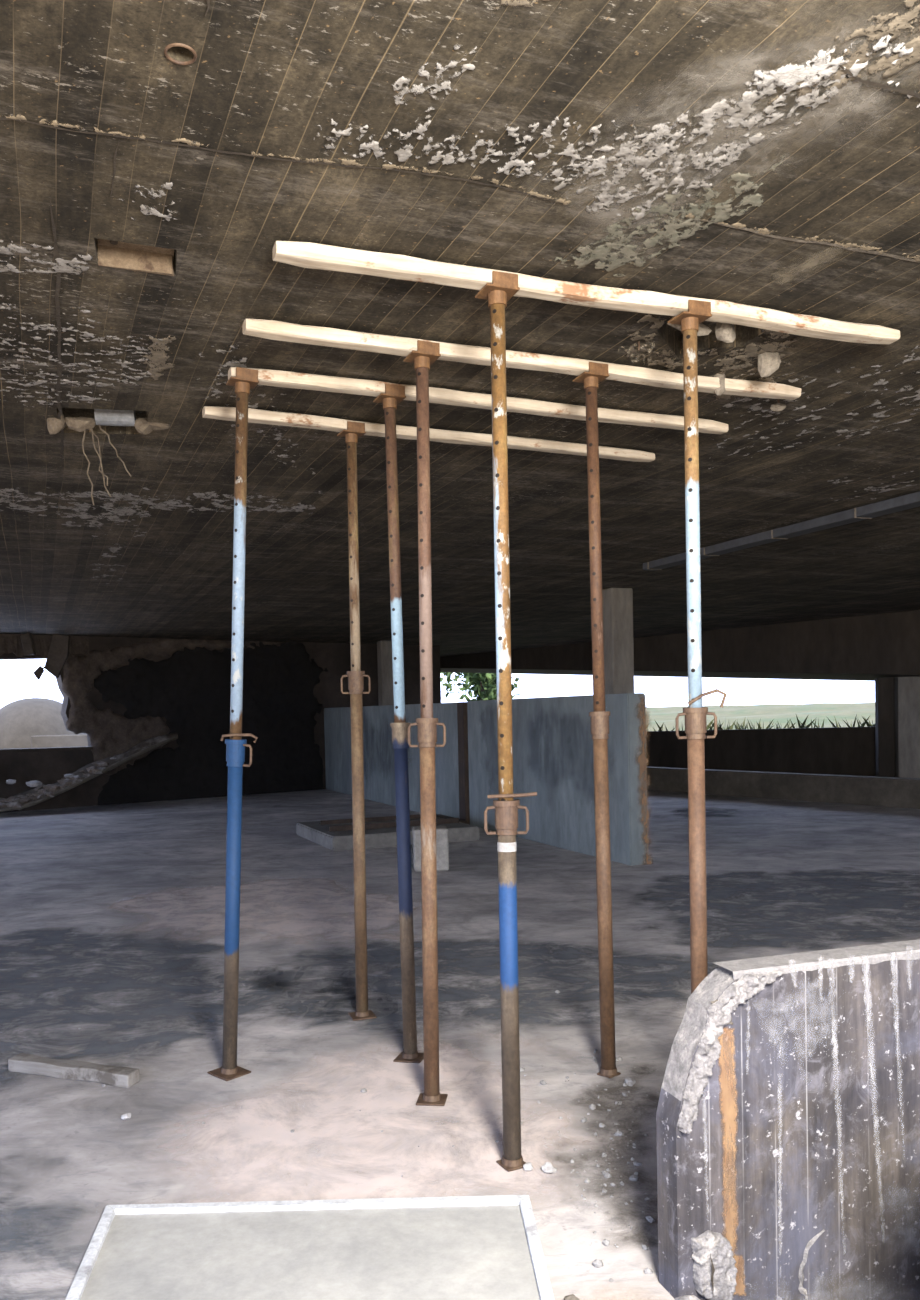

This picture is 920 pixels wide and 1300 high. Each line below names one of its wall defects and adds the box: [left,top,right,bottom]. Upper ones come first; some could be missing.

spalling [313,0,920,277]
leakage [576,53,895,229]
spalling [62,639,282,776]
spalling [677,970,784,1138]
rust [718,1028,746,1295]